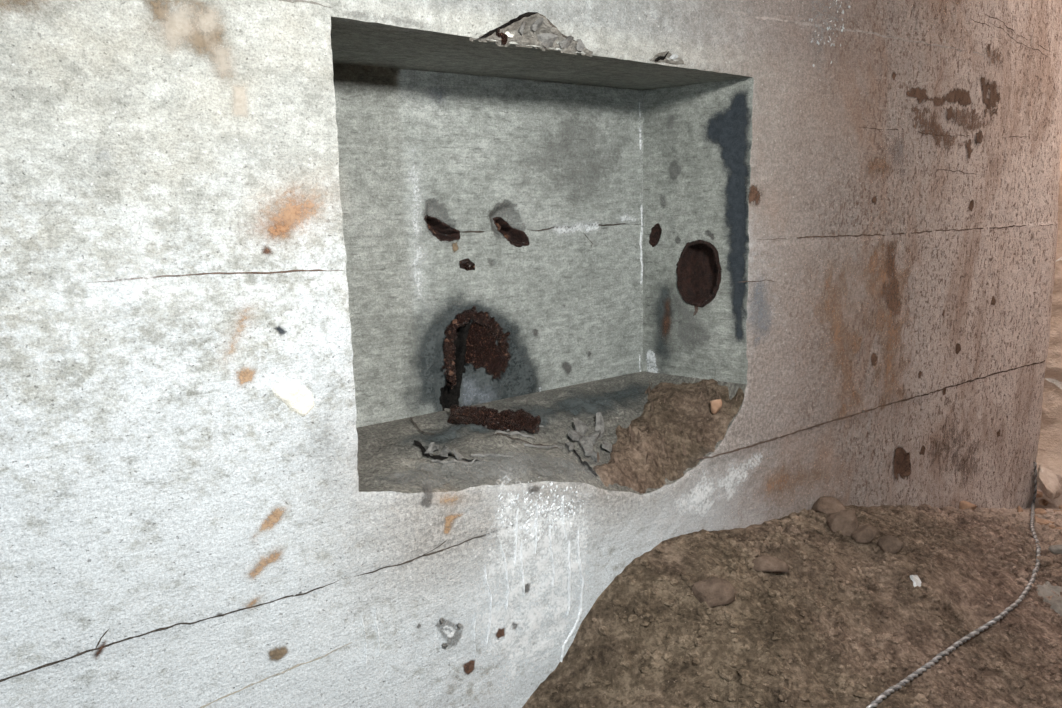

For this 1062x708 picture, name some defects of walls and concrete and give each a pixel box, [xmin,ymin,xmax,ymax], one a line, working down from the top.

spalling [469,12,593,57]
water stain [977,77,1000,120]
water stain [965,131,984,159]
water stain [706,92,750,340]
crack [759,224,1053,240]
crack [88,269,341,283]
crack [694,360,1045,462]
crack [0,523,519,682]